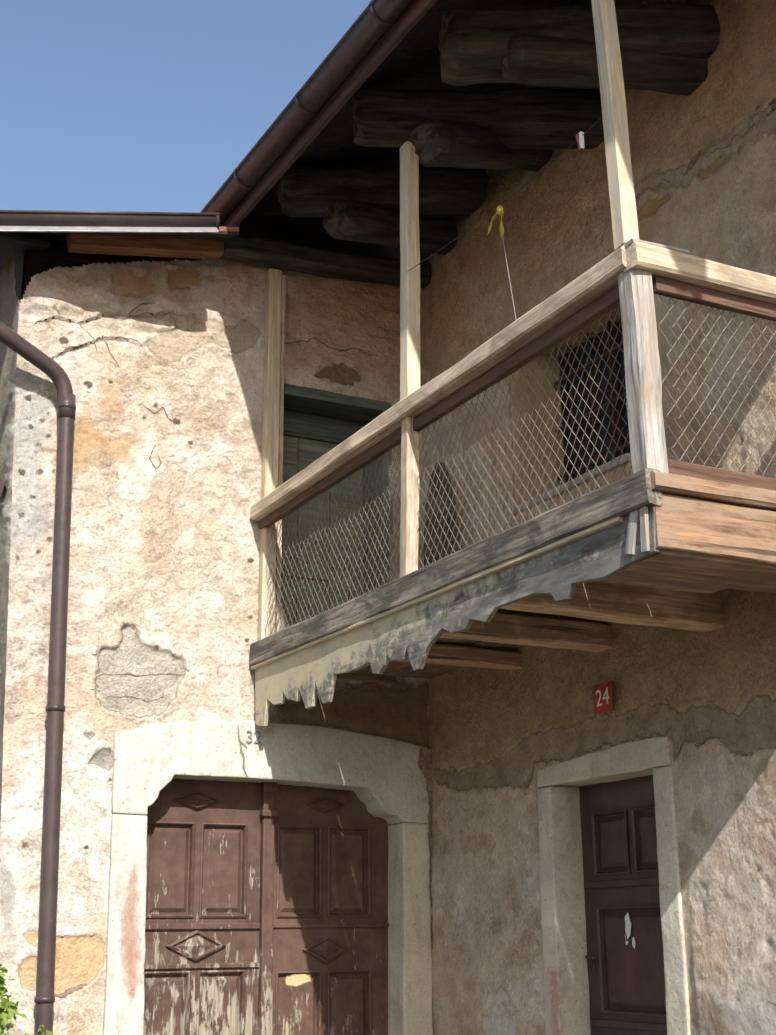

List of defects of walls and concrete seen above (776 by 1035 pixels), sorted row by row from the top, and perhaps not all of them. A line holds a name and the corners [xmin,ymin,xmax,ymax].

crack [35,302,169,366]
flaking render [91,620,190,719]
crack [238,726,248,777]
peeling [418,696,776,797]
flaking render [18,930,38,990]
flaking render [54,932,107,997]